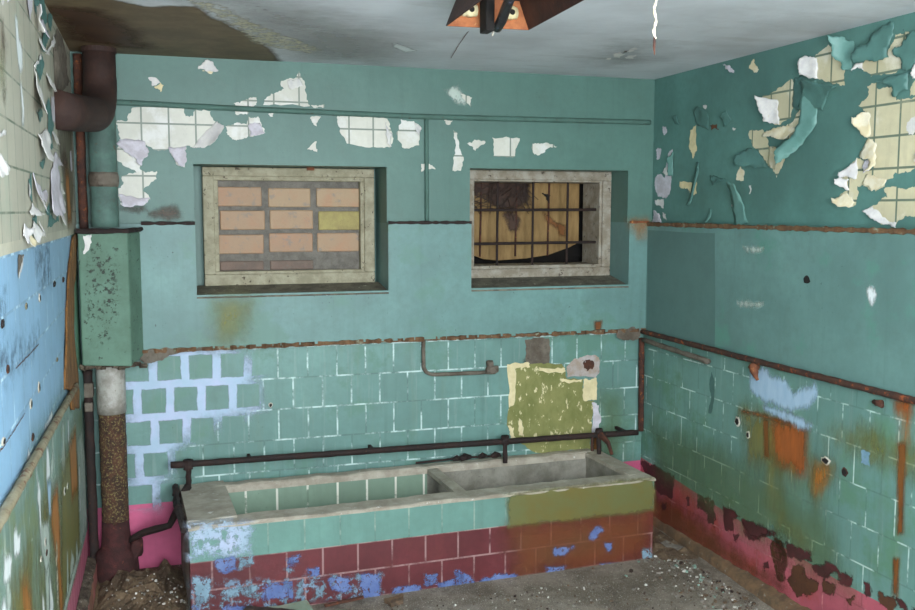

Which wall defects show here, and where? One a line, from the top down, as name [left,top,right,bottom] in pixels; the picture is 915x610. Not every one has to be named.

damp [44,0,280,62]
peeling [23,0,73,247]
peeling [337,116,422,149]
peeling [444,120,520,171]
peeling [710,21,915,228]
corrosion [43,431,80,610]
peeling [126,347,258,504]
peeling [191,554,382,610]
peeling [507,337,601,453]
corrosion [743,409,830,497]
peeling [686,494,915,610]
corrosion [897,402,909,534]